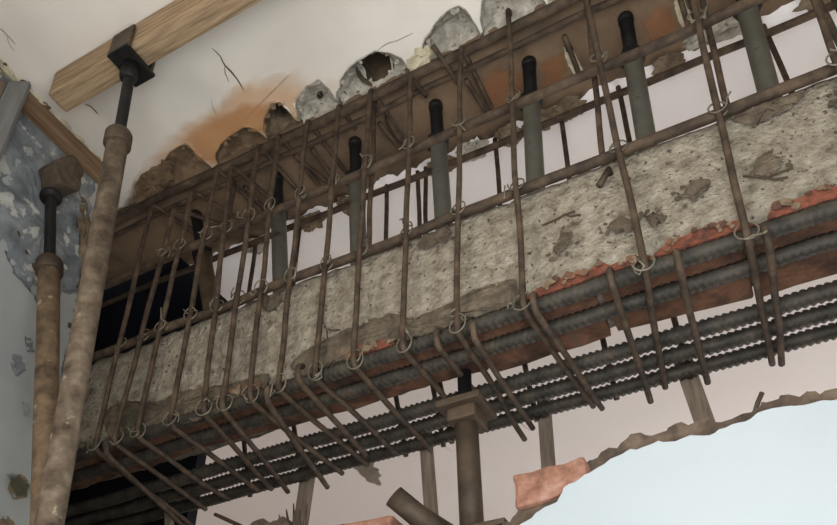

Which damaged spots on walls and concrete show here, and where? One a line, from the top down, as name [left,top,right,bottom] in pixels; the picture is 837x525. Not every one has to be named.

peeling [0,147,54,299]
peeling [0,59,102,162]
peeling [56,192,91,299]
crack [212,48,244,91]
spalling [92,0,837,362]
spalling [65,184,837,525]